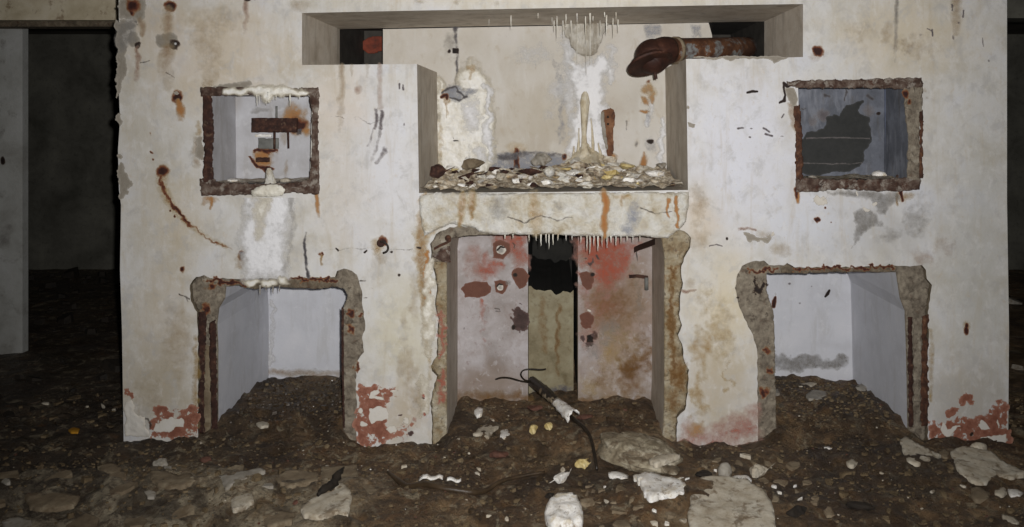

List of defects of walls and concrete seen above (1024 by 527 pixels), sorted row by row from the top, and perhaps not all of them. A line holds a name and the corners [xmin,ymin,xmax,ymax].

corrosion [150,151,226,247]
damp [237,198,294,373]
spalling [145,269,416,447]
spalling [431,226,551,444]
damp [437,27,617,173]
corrosion [600,189,610,239]
peeling [578,236,635,346]
corrosion [812,46,824,57]
spalling [661,228,1014,444]
peeling [802,89,881,176]